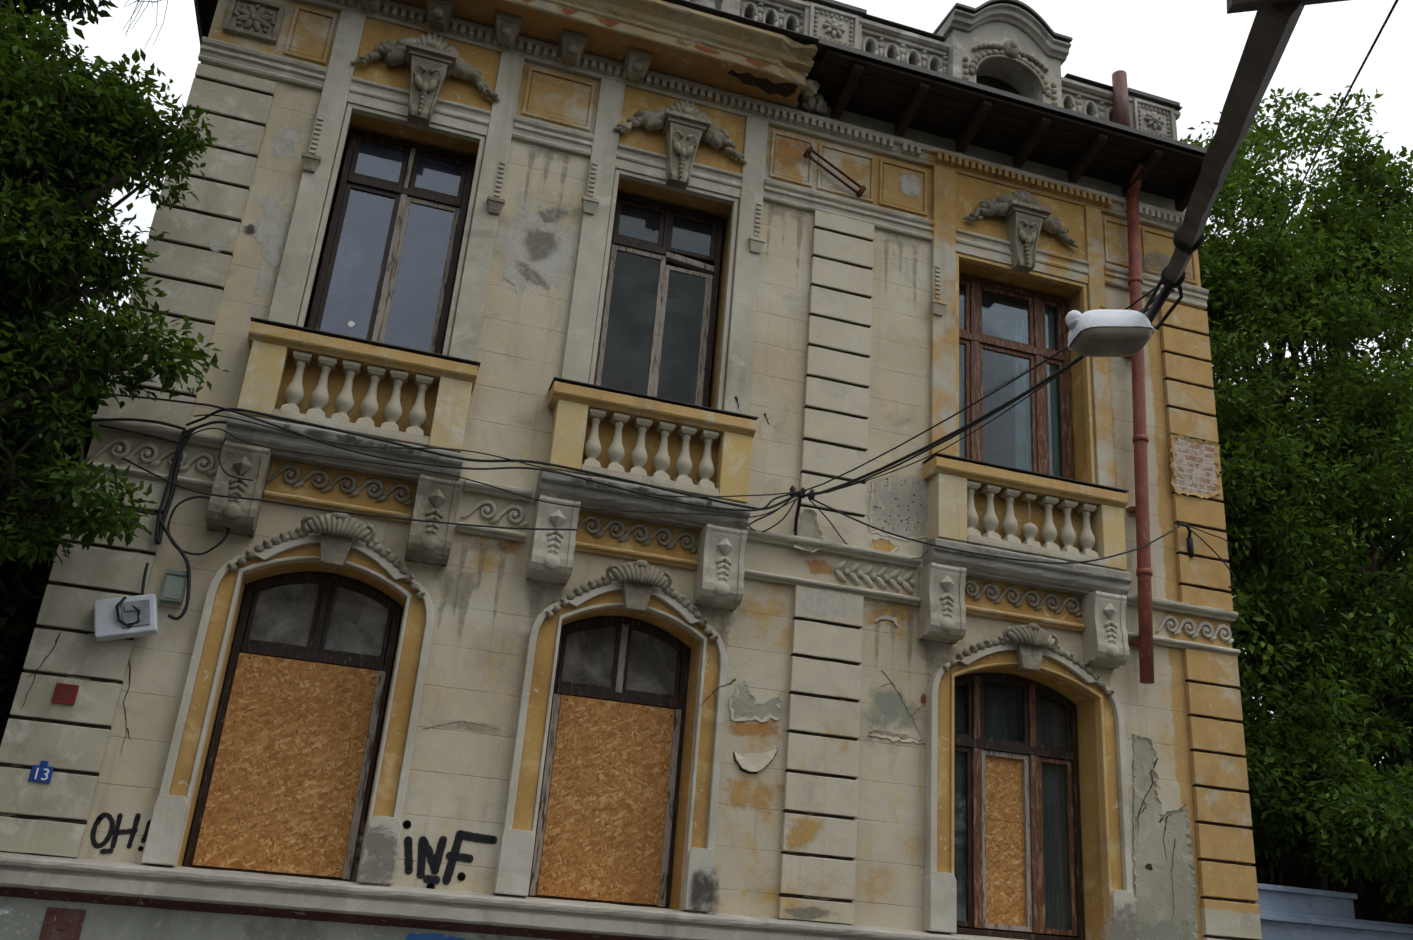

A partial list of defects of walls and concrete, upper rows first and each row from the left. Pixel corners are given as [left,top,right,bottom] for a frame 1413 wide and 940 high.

damp [520,210,567,287]
spalling [1169,433,1222,499]
crack [21,633,61,709]
crack [121,659,131,751]
spalling [729,681,781,722]
peeling [1132,734,1198,940]